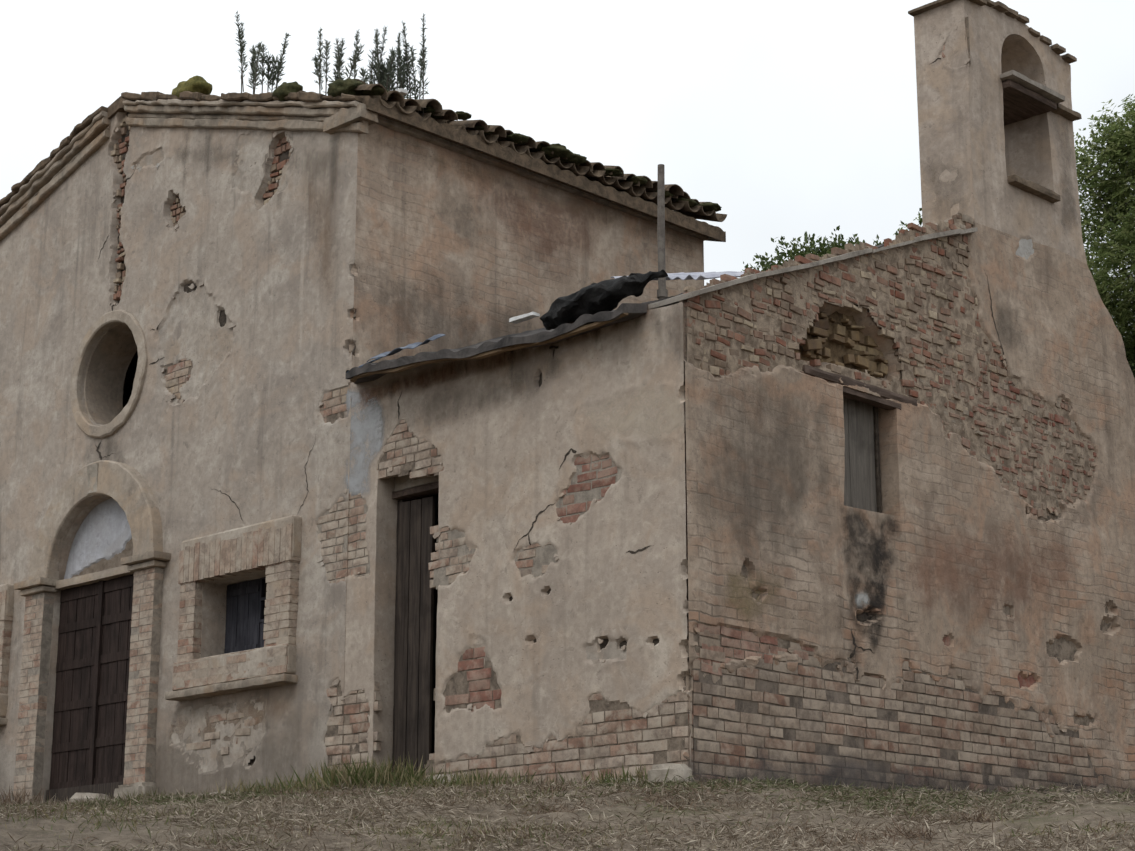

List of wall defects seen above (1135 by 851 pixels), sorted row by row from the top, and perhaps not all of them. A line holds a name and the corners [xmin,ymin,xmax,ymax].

peeling [231,130,294,206]
peeling [149,282,236,406]
flaking render [683,212,1097,521]
flaking render [316,488,370,584]
flaking render [377,420,444,480]
flaking render [428,525,476,589]
crack [513,503,555,553]
crack [559,448,581,469]
flaking render [556,454,622,525]
leakage [845,514,896,647]
flaking render [324,678,383,776]
flaking render [424,613,1099,797]